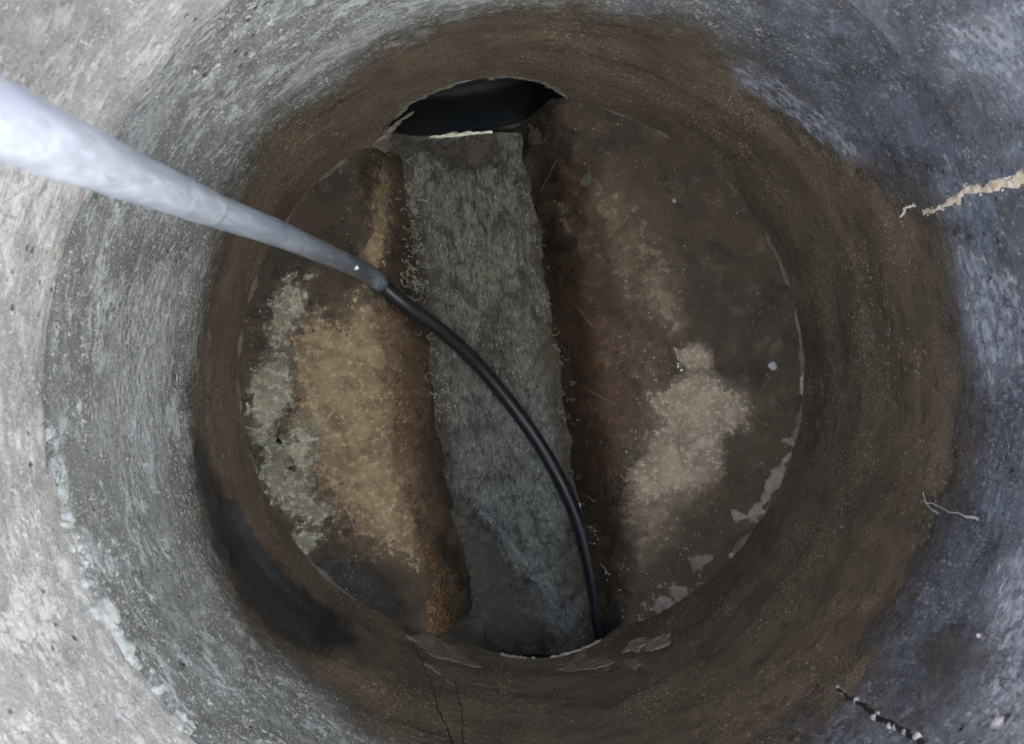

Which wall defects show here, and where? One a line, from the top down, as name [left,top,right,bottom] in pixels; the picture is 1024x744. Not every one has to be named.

crack [899,169,1024,218]
crack [413,643,465,744]
crack [835,685,929,744]